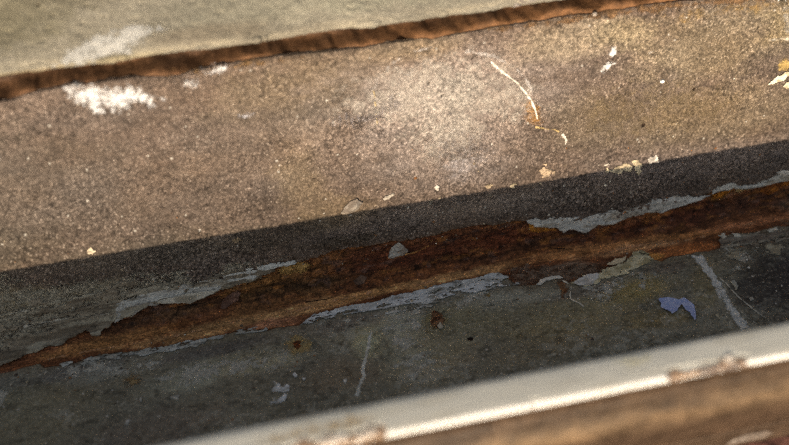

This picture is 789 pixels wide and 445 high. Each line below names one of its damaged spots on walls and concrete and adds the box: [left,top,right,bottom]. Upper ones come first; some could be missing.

efflorescence [65,86,152,113]
spalling [0,170,789,373]